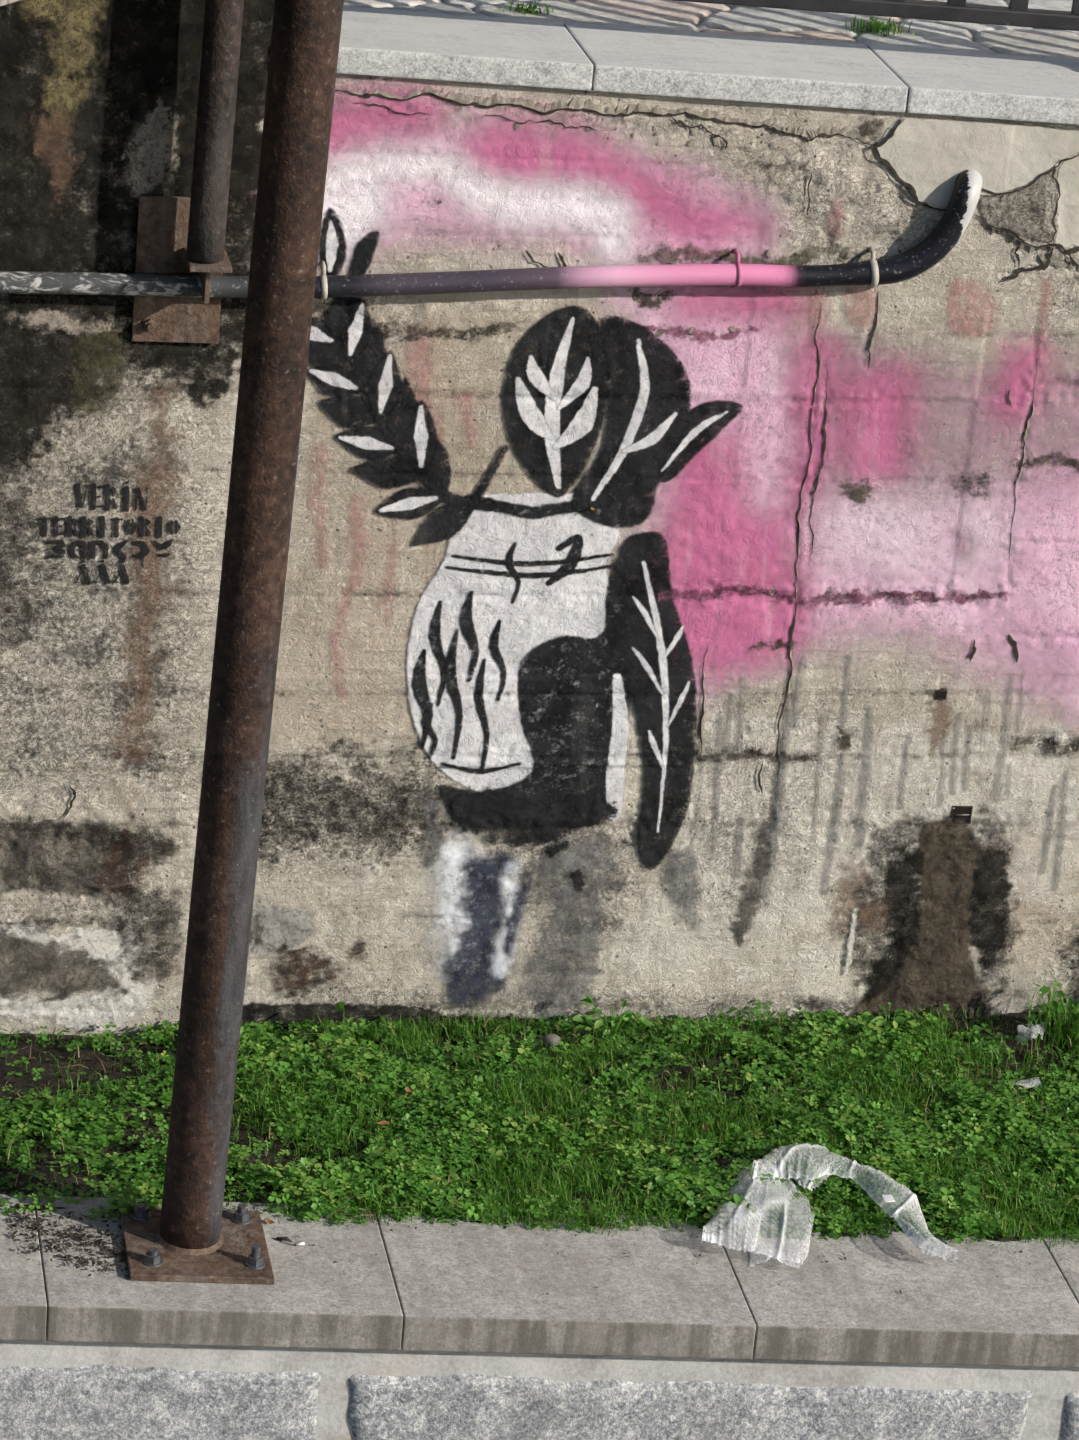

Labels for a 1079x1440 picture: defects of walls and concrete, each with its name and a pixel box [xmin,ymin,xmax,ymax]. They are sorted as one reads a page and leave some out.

leakage [0,0,206,273]
leakage [222,0,275,276]
crack [335,85,1079,282]
leakage [0,294,247,650]
corrosion [115,384,178,761]
crack [758,304,828,793]
crack [1007,348,1039,580]
leakage [0,816,184,1032]
corrosion [99,831,149,898]
leakage [259,739,453,866]
leakage [241,1002,546,1032]
leakage [815,678,1025,1020]